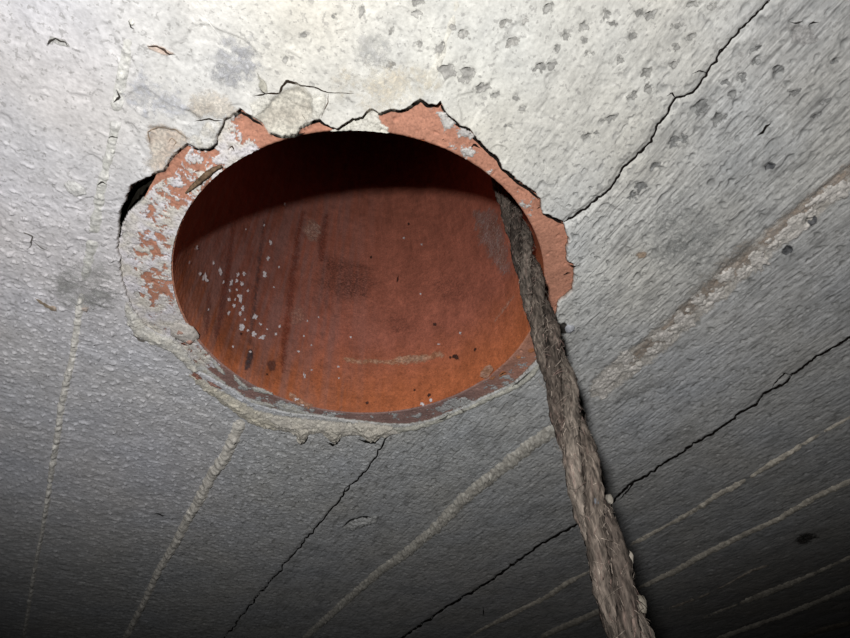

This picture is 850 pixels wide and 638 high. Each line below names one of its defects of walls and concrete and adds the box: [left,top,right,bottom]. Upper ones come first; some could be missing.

hole [635,8,658,21]
hole [532,29,571,73]
hole [669,33,696,69]
spalling [250,77,326,136]
peeling [332,109,389,133]
peeling [436,112,476,159]
crack [378,0,770,224]
hole [626,67,652,100]
peeling [118,113,373,420]
crack [613,336,850,503]
crack [224,437,388,638]
crack [401,524,577,638]